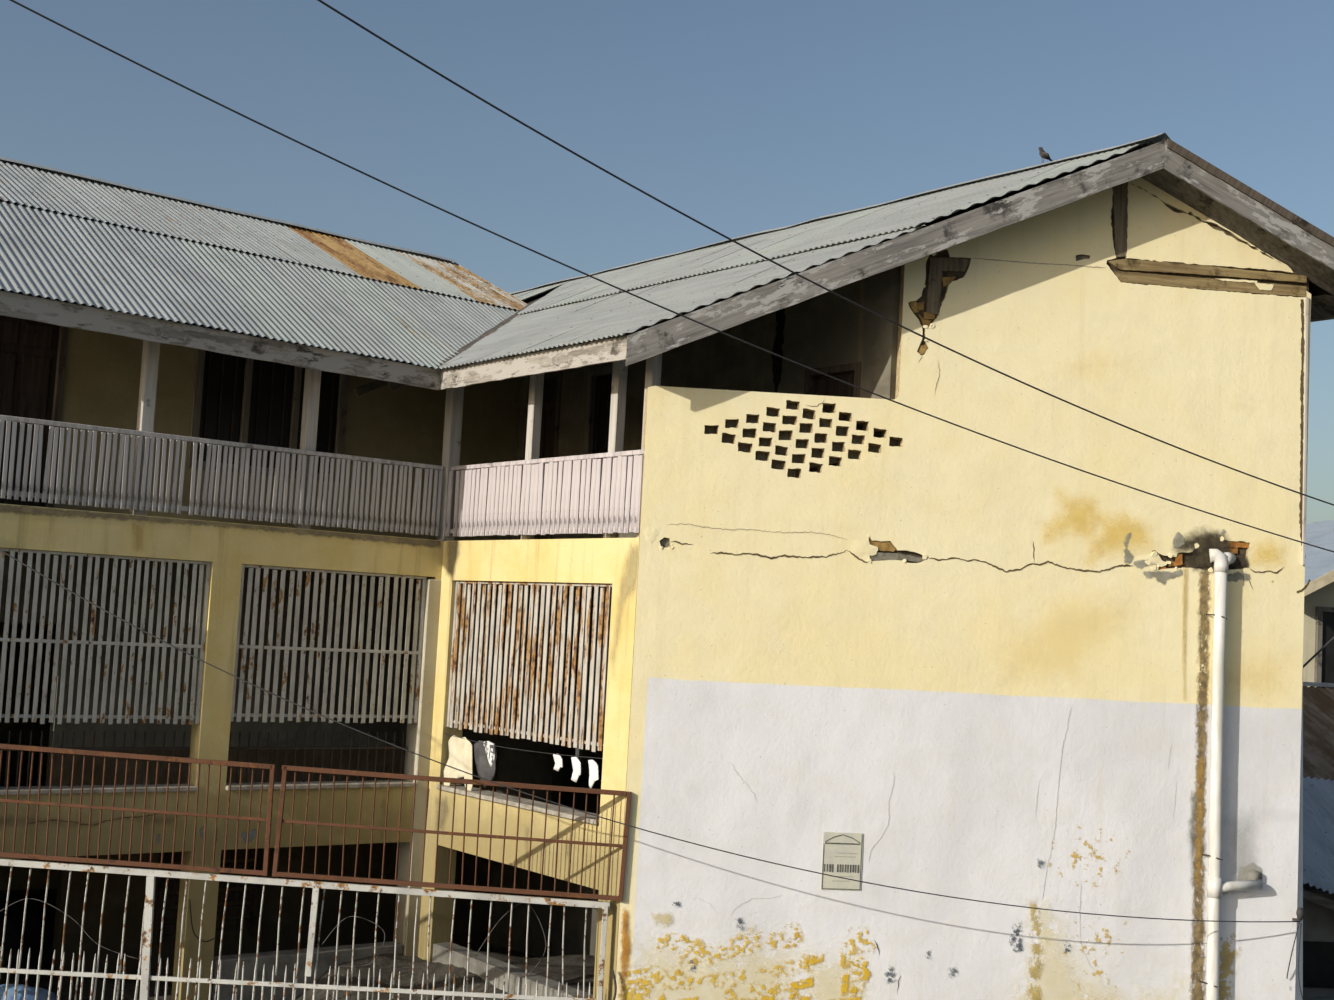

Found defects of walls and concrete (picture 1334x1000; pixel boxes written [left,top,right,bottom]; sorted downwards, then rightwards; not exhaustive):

flaking render [907,250,970,355]
crack [668,523,868,563]
crack [928,542,1133,573]
flaking render [1124,530,1250,584]
damp [1177,532,1248,1000]
peeling [622,914,815,1000]
peeling [840,930,876,994]
damp [1009,904,1042,1000]